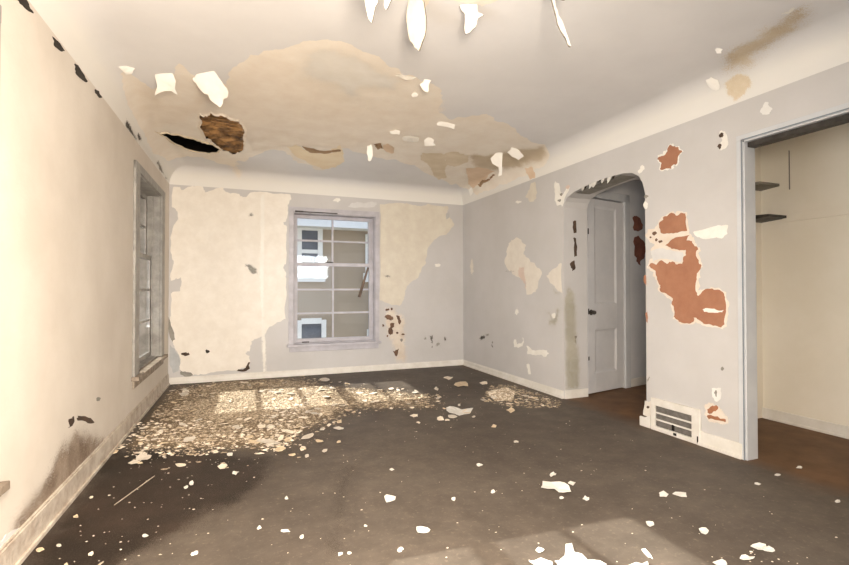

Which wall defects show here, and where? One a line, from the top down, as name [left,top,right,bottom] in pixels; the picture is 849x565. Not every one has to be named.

peeling [365,0,392,23]
peeling [407,0,429,51]
peeling [451,0,497,35]
peeling [551,0,571,47]
leakage [706,5,815,101]
peeling [119,39,551,203]
spalling [657,144,683,171]
peeling [168,186,291,377]
peeling [348,202,454,363]
peeling [504,220,577,295]
spalling [633,211,729,329]